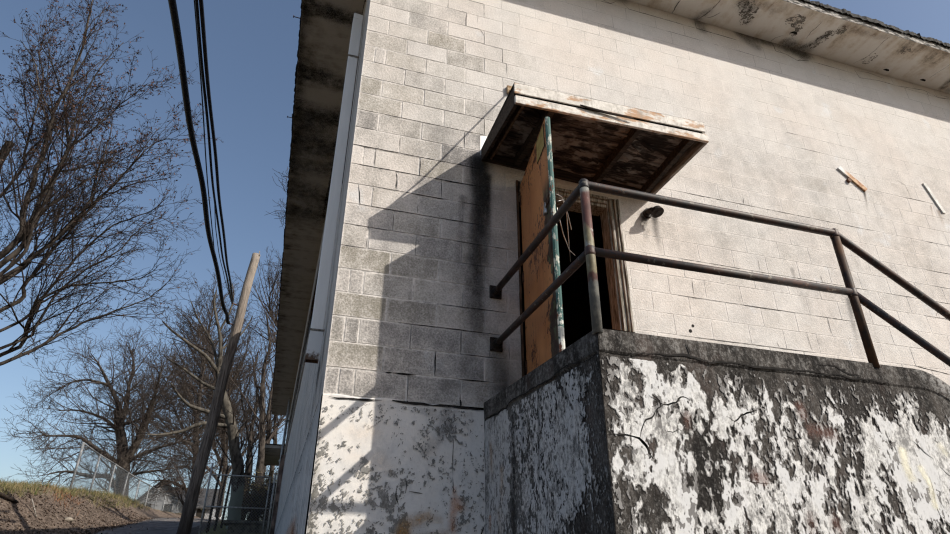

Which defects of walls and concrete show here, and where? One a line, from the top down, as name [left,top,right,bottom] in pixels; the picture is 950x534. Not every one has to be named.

water stain [287,0,364,221]
water stain [470,156,490,306]
crack [277,258,882,528]